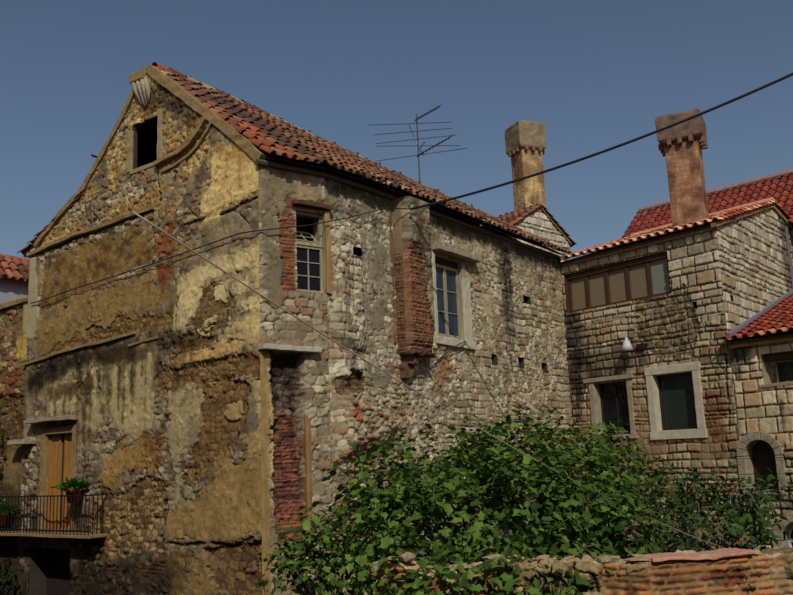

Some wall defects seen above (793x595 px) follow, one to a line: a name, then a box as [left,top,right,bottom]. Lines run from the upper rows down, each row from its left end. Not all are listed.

flaking render [199,146,259,223]
spalling [0,393,25,458]
leakage [27,338,146,417]
flaking render [15,238,301,595]
spalling [332,368,389,397]